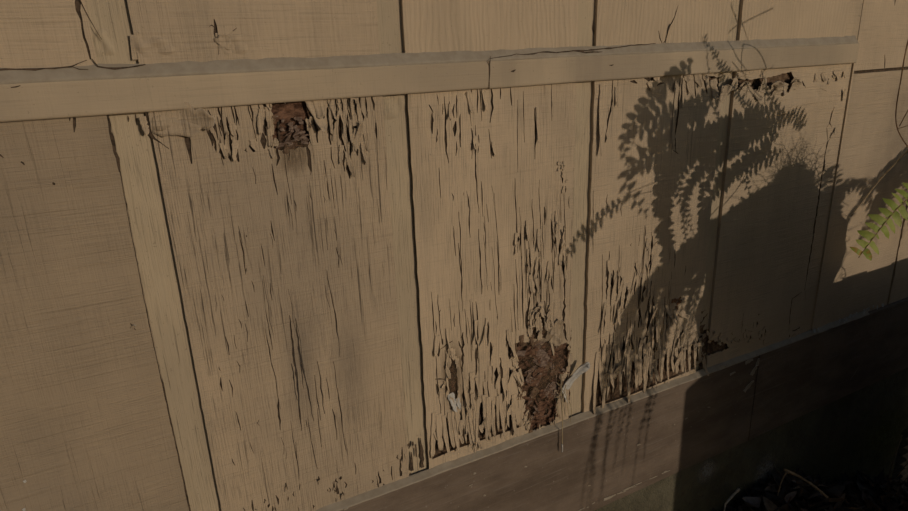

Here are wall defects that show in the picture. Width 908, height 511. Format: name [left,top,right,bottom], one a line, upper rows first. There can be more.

crack [0,0,146,71]
peeling [145,102,218,164]
spalling [266,100,327,172]
spalling [672,70,804,154]
crack [209,20,659,511]
crack [107,112,191,511]
spalling [430,255,765,459]